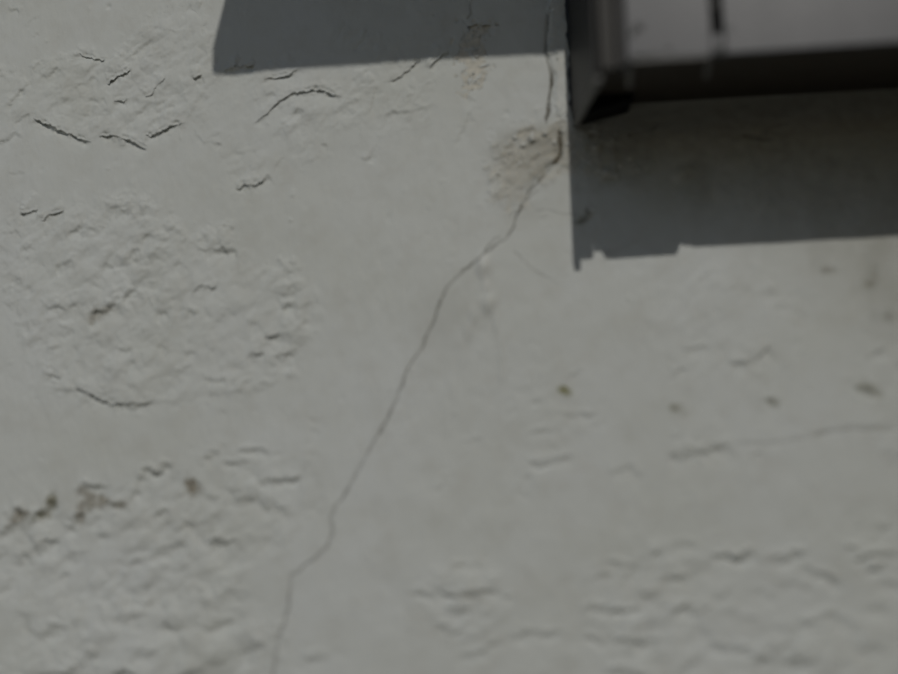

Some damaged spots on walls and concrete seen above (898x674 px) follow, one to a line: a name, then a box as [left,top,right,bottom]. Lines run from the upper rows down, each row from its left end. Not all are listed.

peeling [0,1,454,194]
crack [538,74,562,182]
spalling [483,108,649,229]